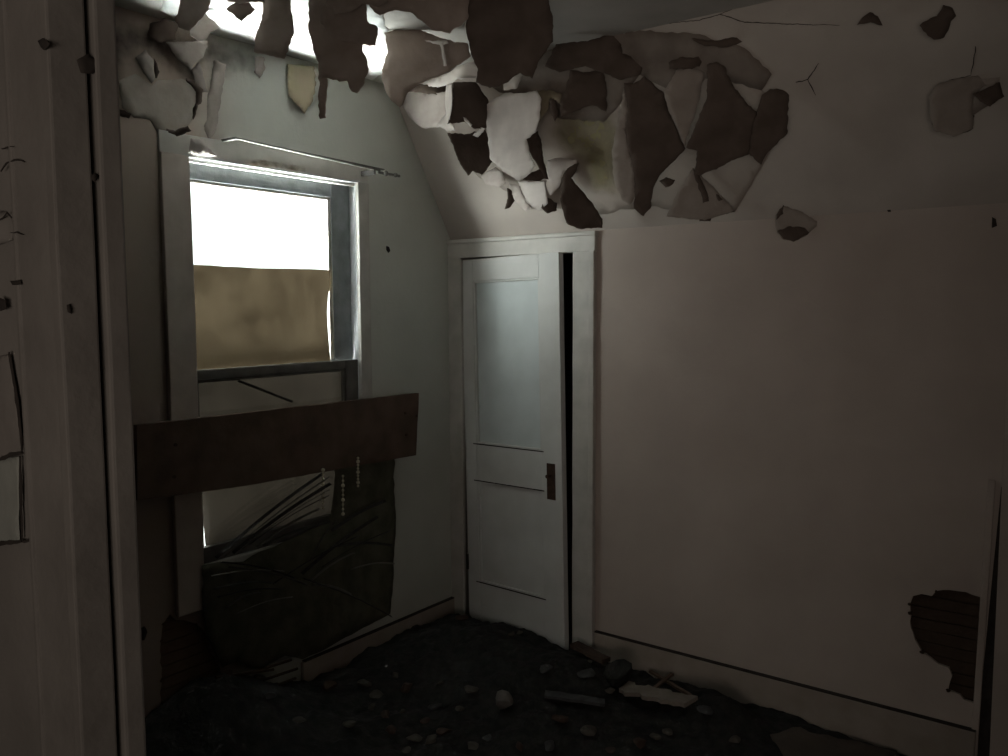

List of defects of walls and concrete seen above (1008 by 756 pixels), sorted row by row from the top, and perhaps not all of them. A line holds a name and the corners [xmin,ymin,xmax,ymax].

peeling [857,12,882,25]
peeling [920,5,956,40]
peeling [118,0,789,229]
peeling [929,75,1004,137]
peeling [775,205,817,242]
flaking render [908,590,980,701]